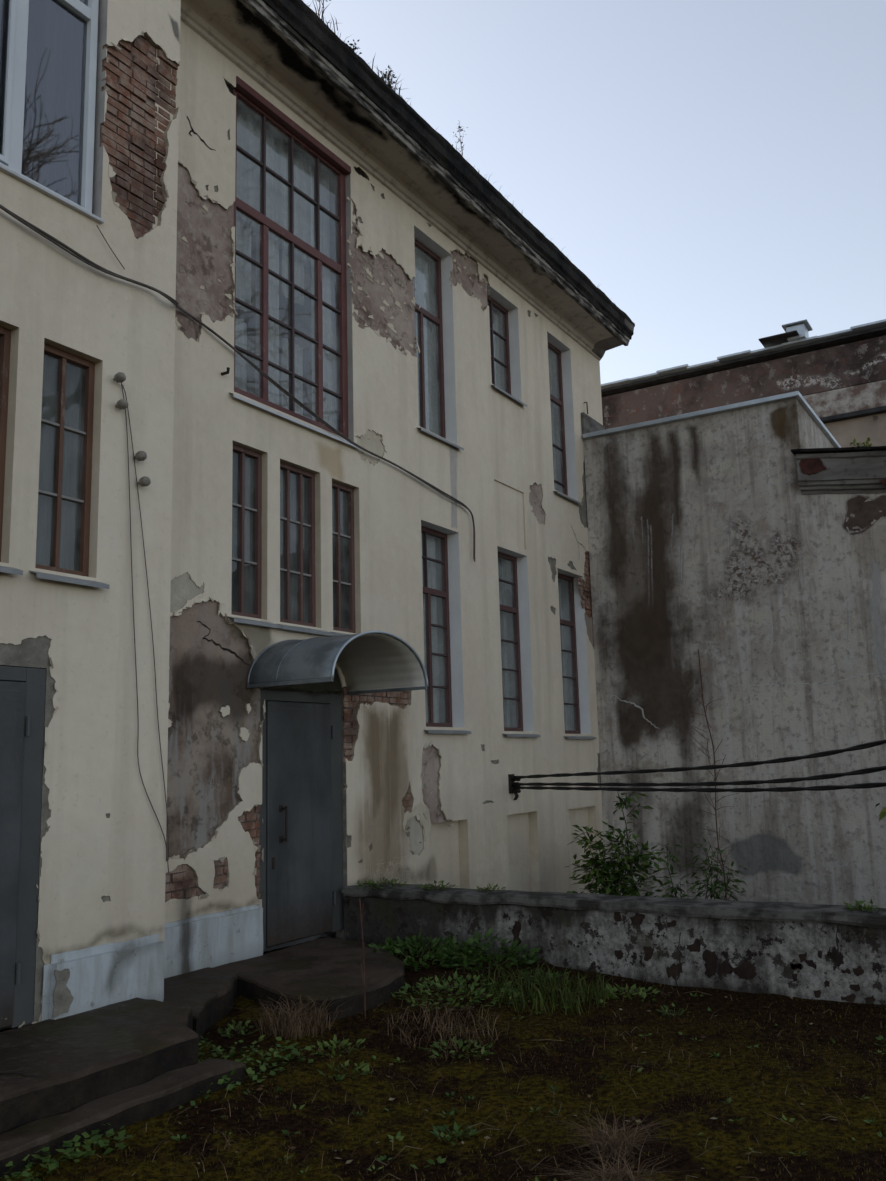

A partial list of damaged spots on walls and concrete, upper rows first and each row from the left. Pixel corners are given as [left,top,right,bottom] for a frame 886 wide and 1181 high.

flaking render [99,31,238,341]
flaking render [347,197,421,356]
flaking render [449,249,490,312]
flaking render [777,353,886,390]
peeling [356,430,385,466]
flaking render [529,483,545,524]
flaking render [844,479,886,534]
leakage [604,426,699,747]
flaking render [165,572,266,901]
flaking render [342,686,410,764]
crack [613,695,660,729]
flaking render [402,741,453,827]